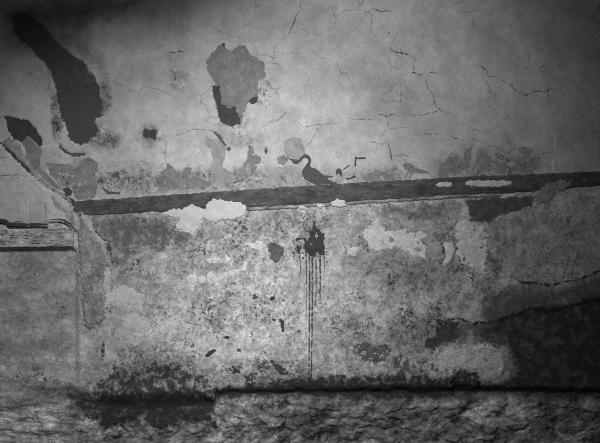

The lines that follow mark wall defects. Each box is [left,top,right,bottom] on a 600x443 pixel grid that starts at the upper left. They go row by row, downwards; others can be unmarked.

spalling [206,43,266,127]
crack [349,48,452,126]
crack [475,66,565,99]
peeling [162,198,247,238]
crack [436,270,600,326]
leakage [43,279,600,430]